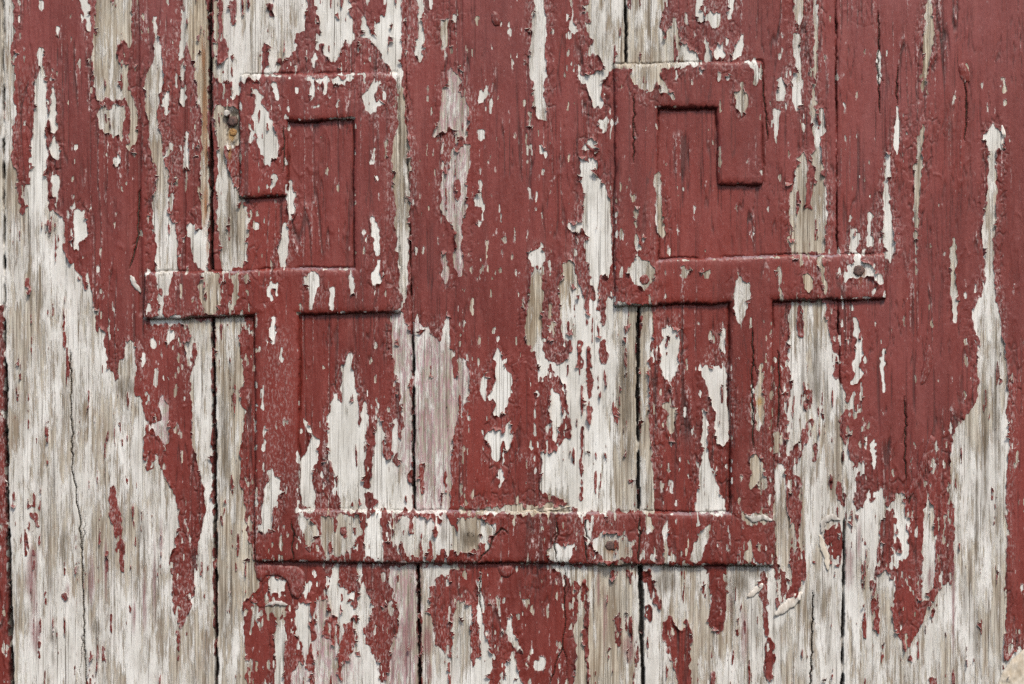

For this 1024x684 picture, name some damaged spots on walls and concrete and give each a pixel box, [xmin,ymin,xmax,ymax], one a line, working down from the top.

peeling [77,0,138,157]
peeling [261,180,297,301]
peeling [296,216,386,315]
peeling [421,65,502,297]
peeling [510,0,554,175]
peeling [564,0,763,139]
peeling [733,272,772,340]
peeling [769,0,831,294]
peeling [835,106,908,311]
peeling [480,327,513,488]
crack [69,352,87,682]
peeling [494,591,546,684]